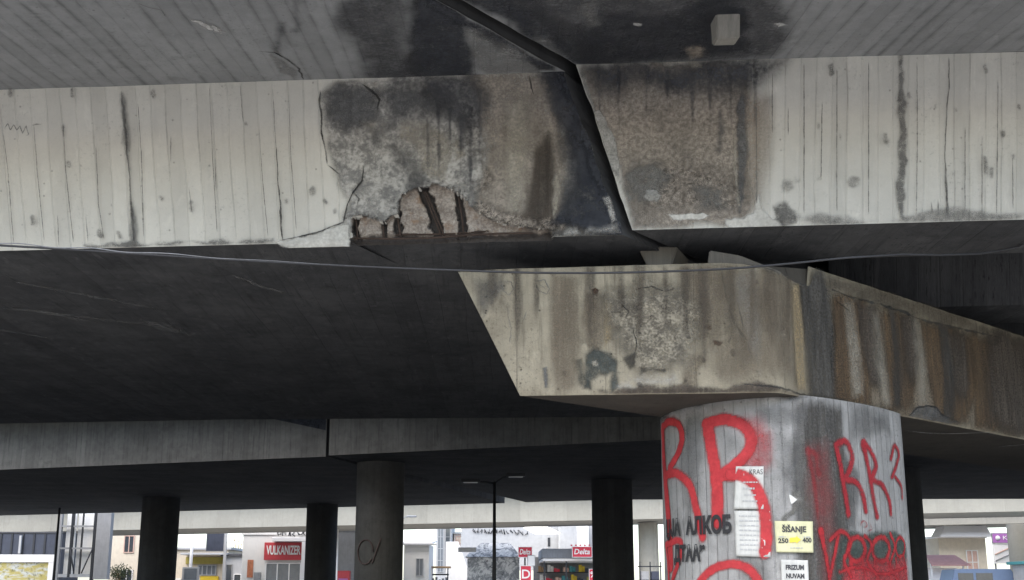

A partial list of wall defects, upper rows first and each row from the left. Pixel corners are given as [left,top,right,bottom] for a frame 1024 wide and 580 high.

crack [189,89,217,227]
crack [261,101,364,240]
peeling [319,28,613,246]
leakage [338,0,787,235]
leakage [543,268,593,388]
peeling [599,282,808,396]